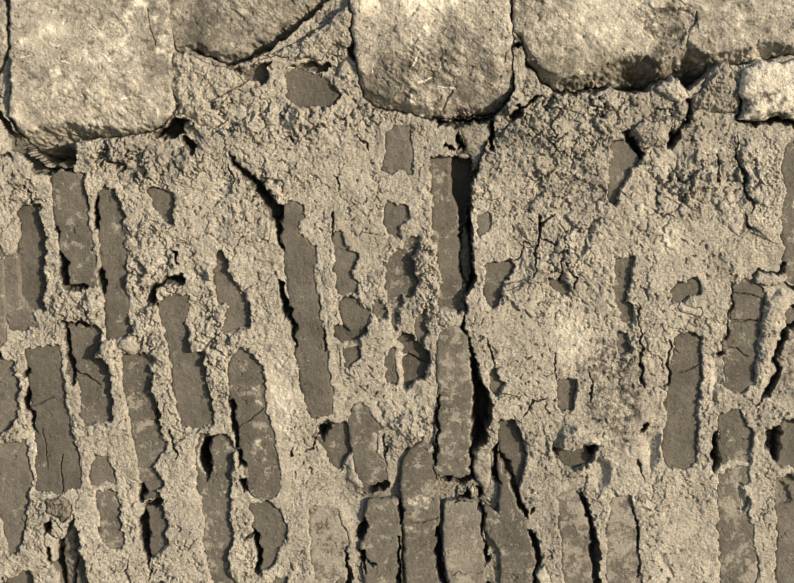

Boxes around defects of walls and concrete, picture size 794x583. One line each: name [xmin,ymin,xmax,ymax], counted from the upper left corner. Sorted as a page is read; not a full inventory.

crack [430,90,496,179]
spalling [666,98,694,151]
crack [227,152,285,249]
spalling [58,251,108,295]
spalling [146,250,186,307]
crack [278,279,299,348]
crack [458,200,542,583]
crack [755,320,794,407]
spalling [199,434,218,478]
spalling [764,425,782,462]
spalling [137,482,164,567]
crack [576,491,603,583]